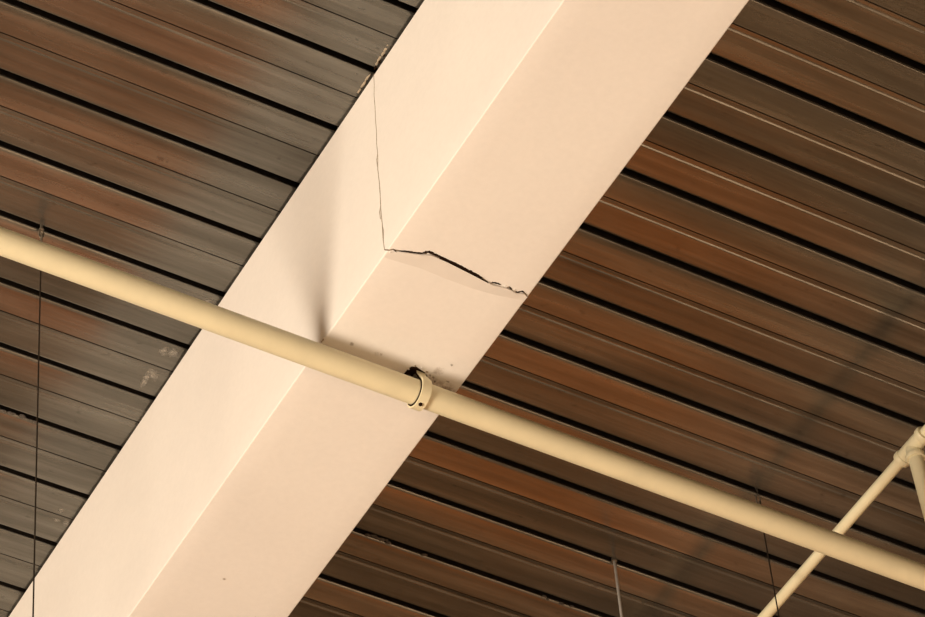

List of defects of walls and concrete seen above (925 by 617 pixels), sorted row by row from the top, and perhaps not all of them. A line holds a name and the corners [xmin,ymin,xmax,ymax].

crack [373,74,527,296]